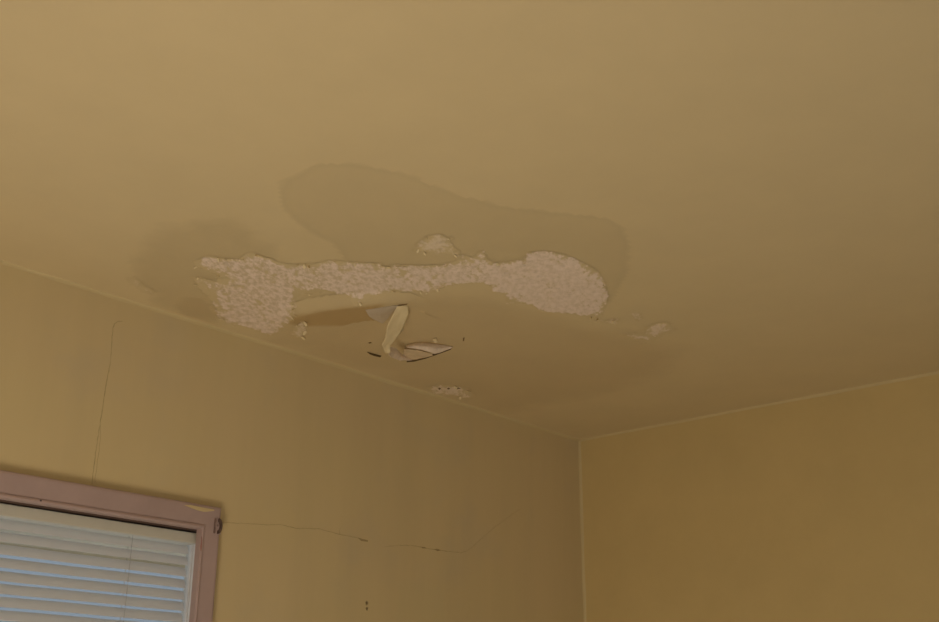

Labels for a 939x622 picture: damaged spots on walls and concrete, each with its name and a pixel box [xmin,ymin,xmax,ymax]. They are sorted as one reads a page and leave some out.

peeling [190,233,610,340]